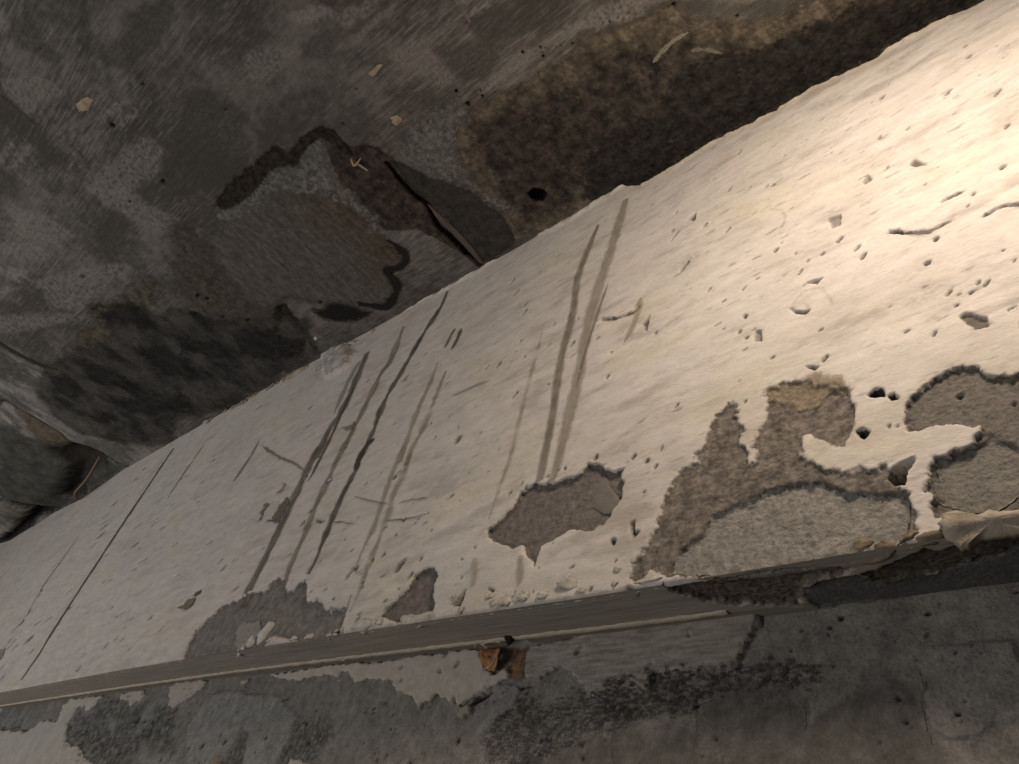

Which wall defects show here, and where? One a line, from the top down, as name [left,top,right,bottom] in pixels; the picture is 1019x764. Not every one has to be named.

peeling [0,695,102,764]
water stain [37,139,410,447]
water stain [240,351,369,608]
spalling [185,568,438,662]
spalling [216,126,468,255]
water stain [284,291,448,591]
corrosion [505,648,529,680]
spalling [488,464,624,566]
water stain [537,198,628,481]
water stain [480,653,824,764]
water stain [395,0,982,261]
spalling [524,366,1019,698]